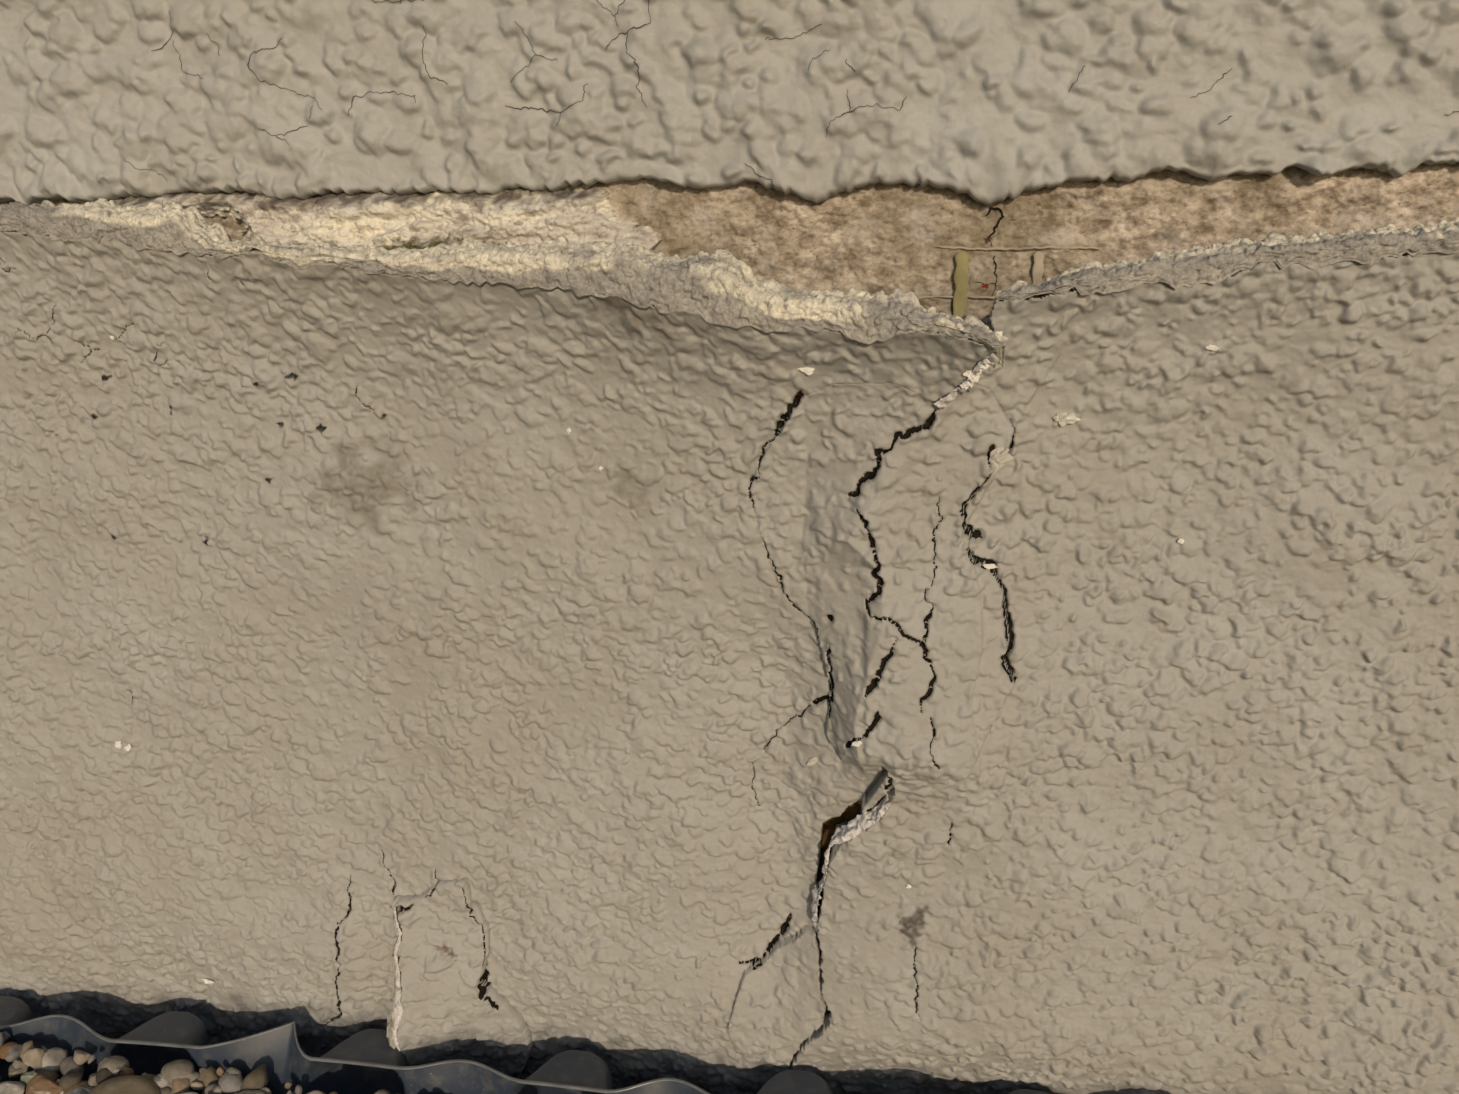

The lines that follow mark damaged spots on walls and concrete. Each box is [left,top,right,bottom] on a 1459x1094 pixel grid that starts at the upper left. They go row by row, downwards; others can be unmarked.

crack [748,391,803,508]
flaking render [114,162,1459,1094]
crack [750,408,1016,806]
crack [323,880,352,1026]
crack [381,850,499,1010]
crack [739,881,824,970]
crack [913,947,921,1020]